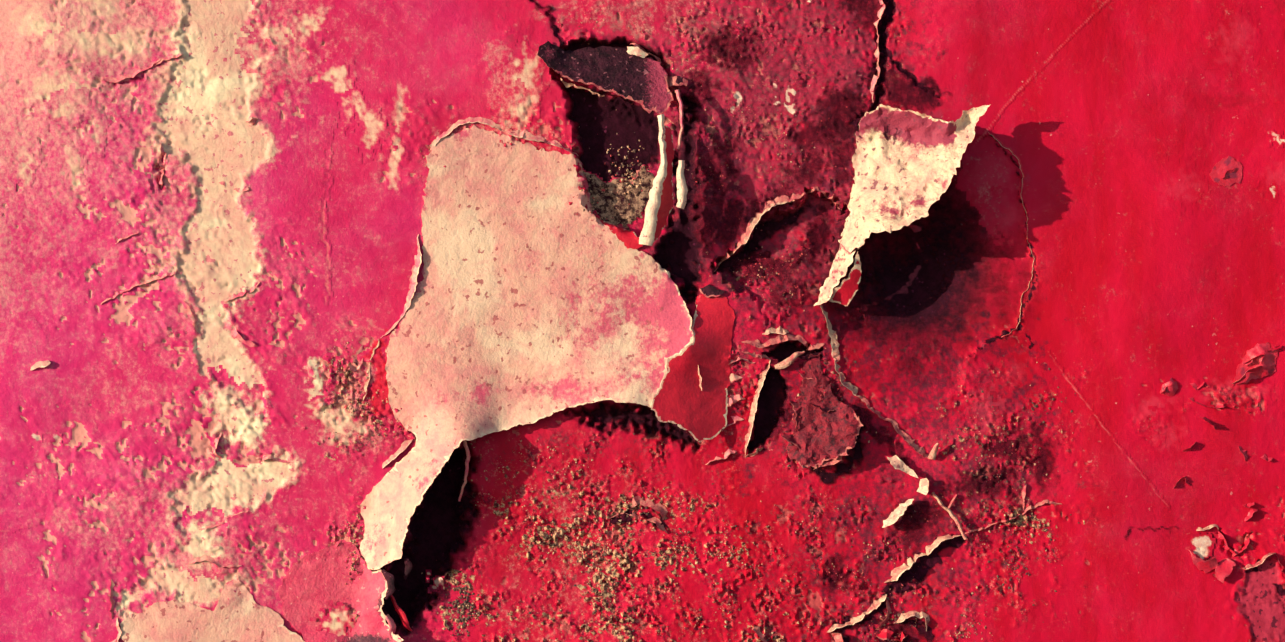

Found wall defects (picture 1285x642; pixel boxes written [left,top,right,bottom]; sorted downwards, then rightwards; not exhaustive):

crack [977,132,1037,349]
peeling [101,0,1005,642]
peeling [1188,382,1225,429]
crack [827,484,1061,642]
peeling [1187,524,1285,642]
peeling [1243,502,1258,521]